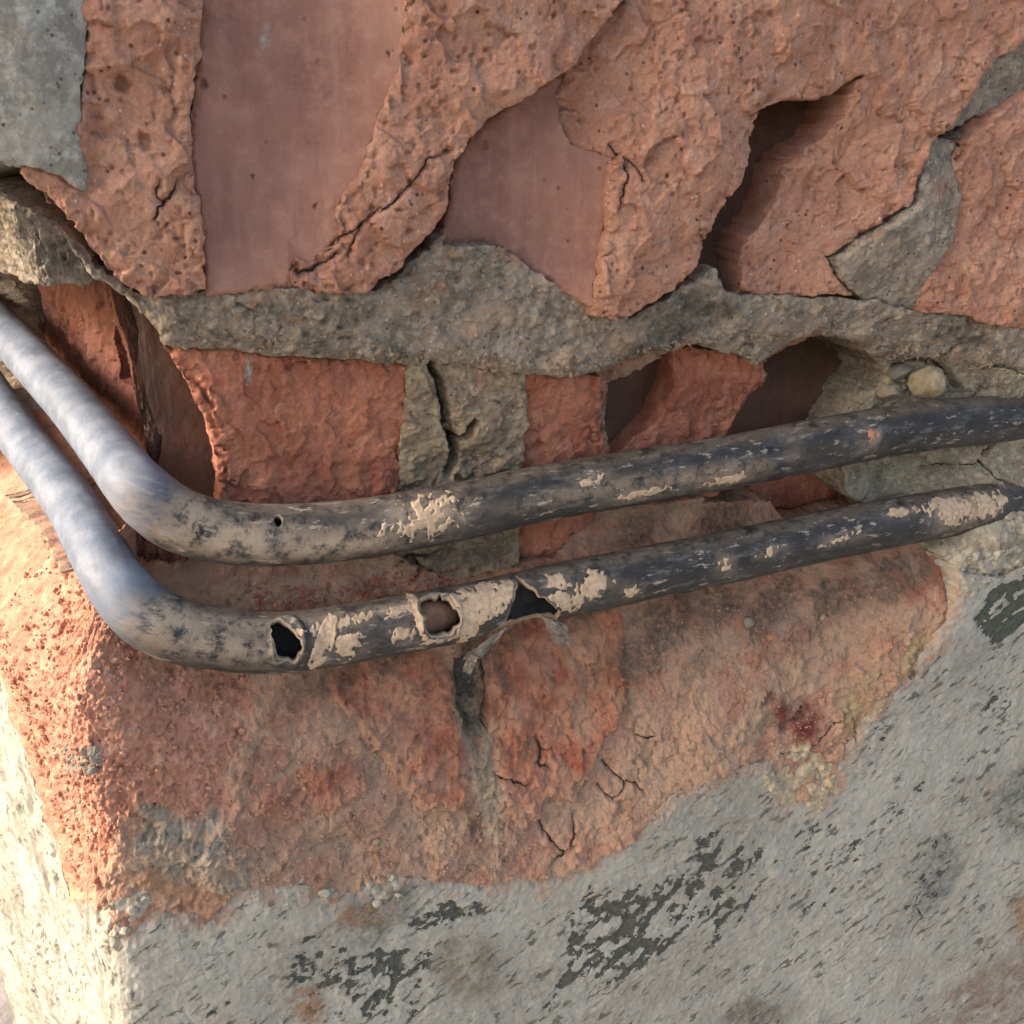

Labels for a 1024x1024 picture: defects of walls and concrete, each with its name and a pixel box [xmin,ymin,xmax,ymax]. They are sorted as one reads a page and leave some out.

crack [297,150,450,274]
crack [427,364,464,457]
spalling [53,739,103,780]
crack [495,737,550,787]
crack [598,759,644,800]
spalling [763,744,842,851]
crack [538,815,575,862]
spalling [93,889,150,951]
spalling [361,873,402,908]
peeling [408,900,487,931]
peeling [802,849,847,914]
peeling [904,860,951,910]